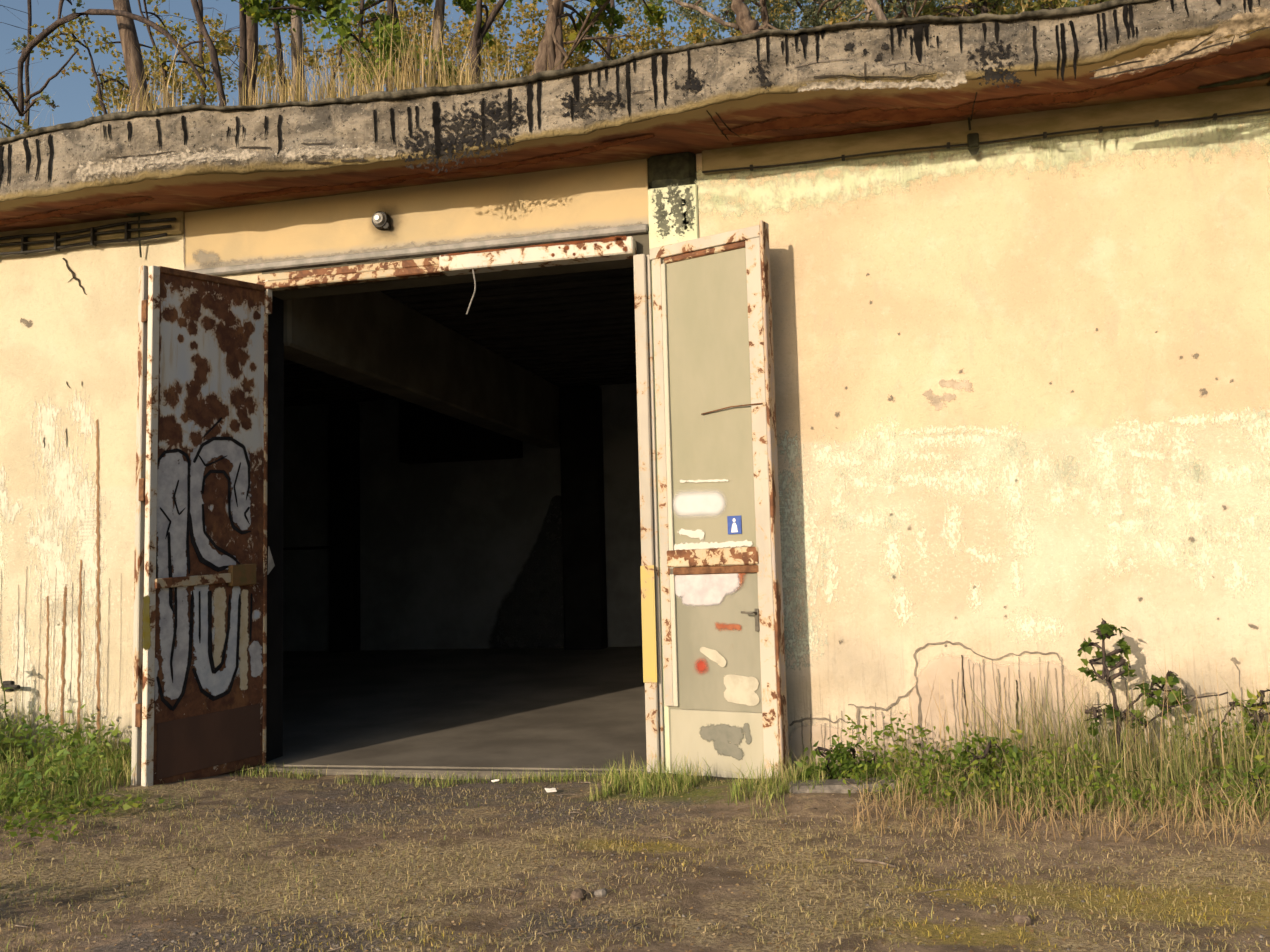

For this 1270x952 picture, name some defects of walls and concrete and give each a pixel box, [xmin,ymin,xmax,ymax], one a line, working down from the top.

leakage [756,30,826,67]
leakage [890,23,938,62]
leakage [1055,20,1078,81]
leakage [1096,5,1138,51]
leakage [373,106,418,144]
leakage [526,80,541,132]
leakage [571,59,635,120]
leakage [651,54,667,108]
leakage [0,134,52,186]
corrosion [441,236,628,257]
corrosion [45,419,101,734]
crack [789,641,1061,759]